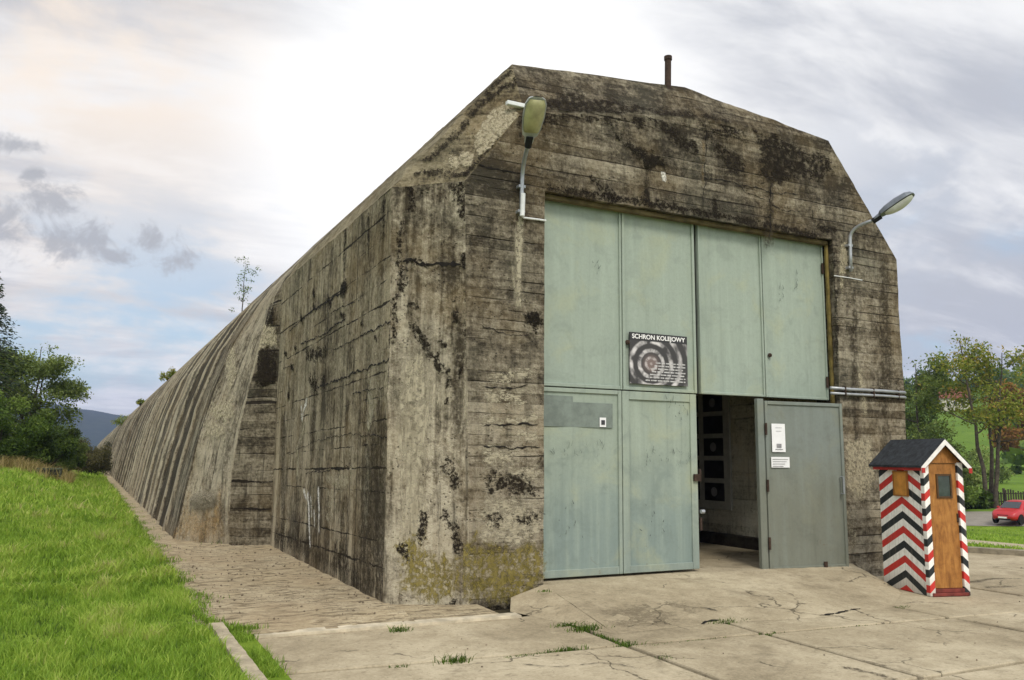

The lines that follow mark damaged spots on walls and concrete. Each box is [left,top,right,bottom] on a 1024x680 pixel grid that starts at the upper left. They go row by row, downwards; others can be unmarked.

crack [403,258,462,268]
spalling [255,303,297,387]
water stain [480,367,543,484]
water stain [475,497,543,547]